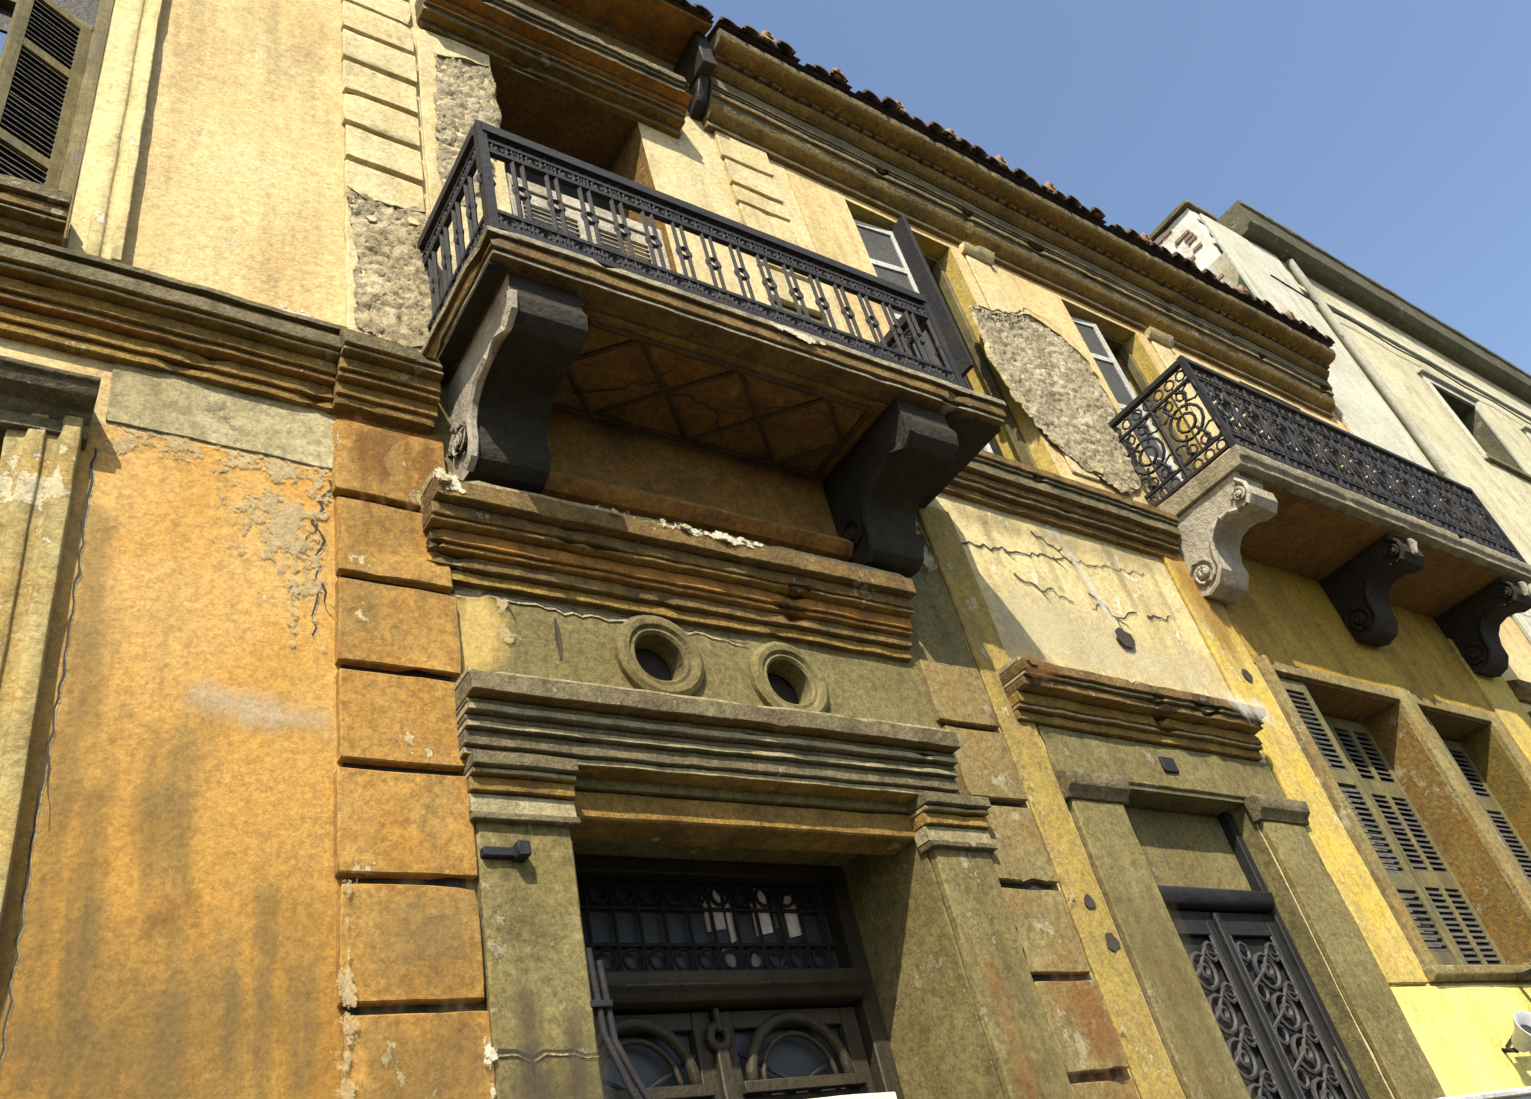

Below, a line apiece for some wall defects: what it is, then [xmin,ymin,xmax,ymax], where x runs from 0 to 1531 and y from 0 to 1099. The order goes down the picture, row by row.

flaking render [433,52,502,196]
flaking render [461,158,497,206]
flaking render [344,185,432,347]
flaking render [968,305,1144,494]
peeling [87,423,339,651]
crack [961,531,1170,629]
crack [0,448,99,1066]